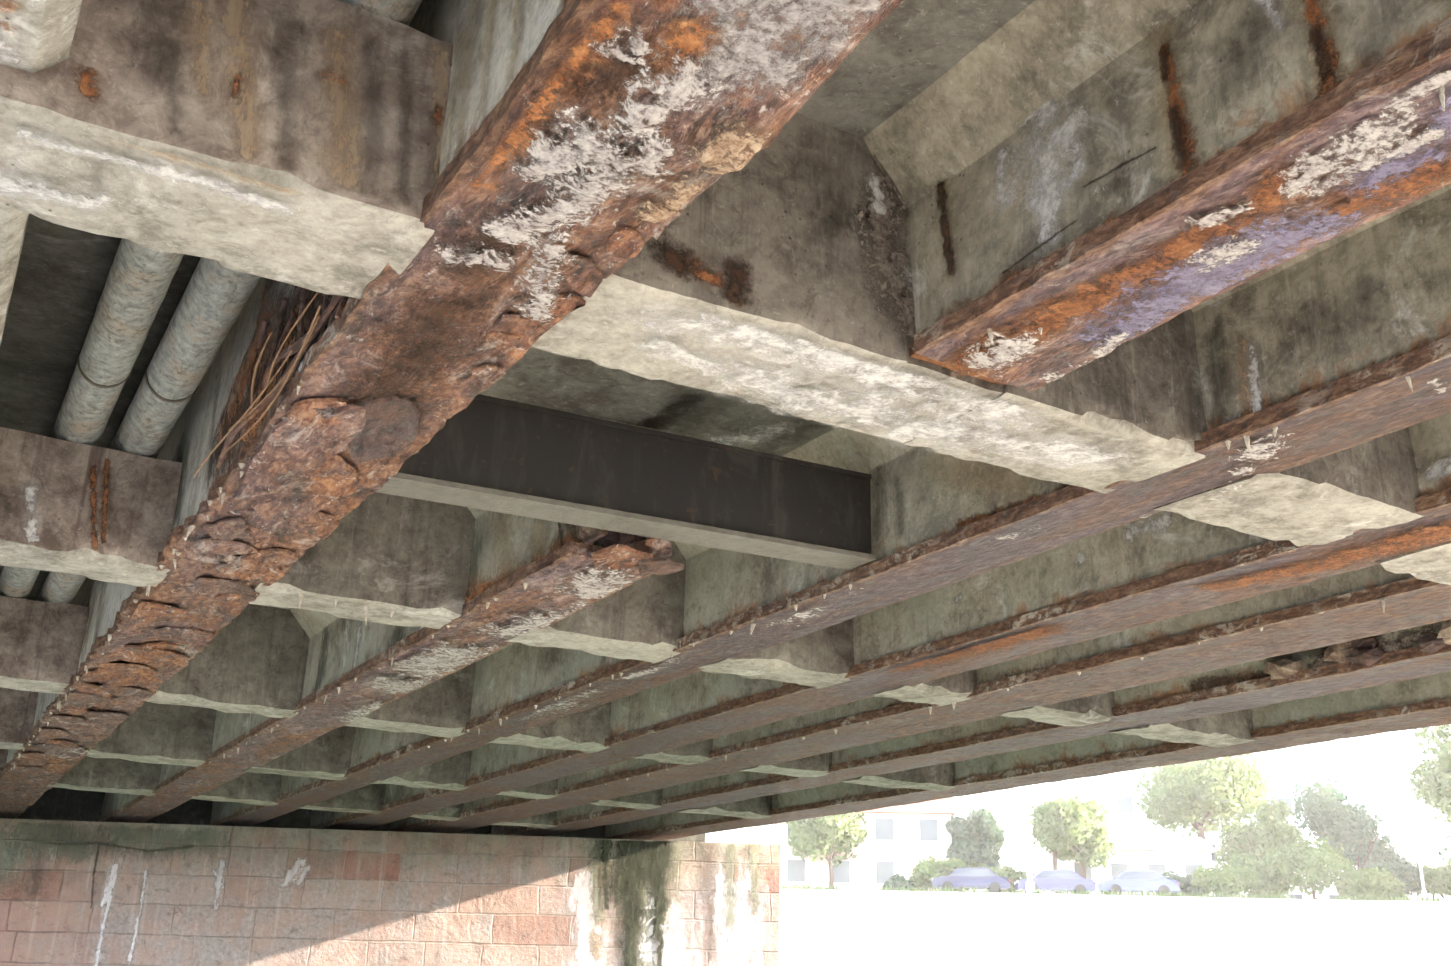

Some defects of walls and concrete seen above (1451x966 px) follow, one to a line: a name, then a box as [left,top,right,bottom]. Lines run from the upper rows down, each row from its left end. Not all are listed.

corrosion [469,0,633,192]
corrosion [471,117,778,385]
leakage [434,0,882,321]
leakage [994,99,1085,242]
corrosion [944,163,1317,376]
corrosion [1159,44,1198,177]
spalling [193,279,349,487]
corrosion [190,396,420,615]
corrosion [8,601,216,775]
leakage [0,823,228,966]
leakage [280,858,310,887]
leakage [569,840,763,966]